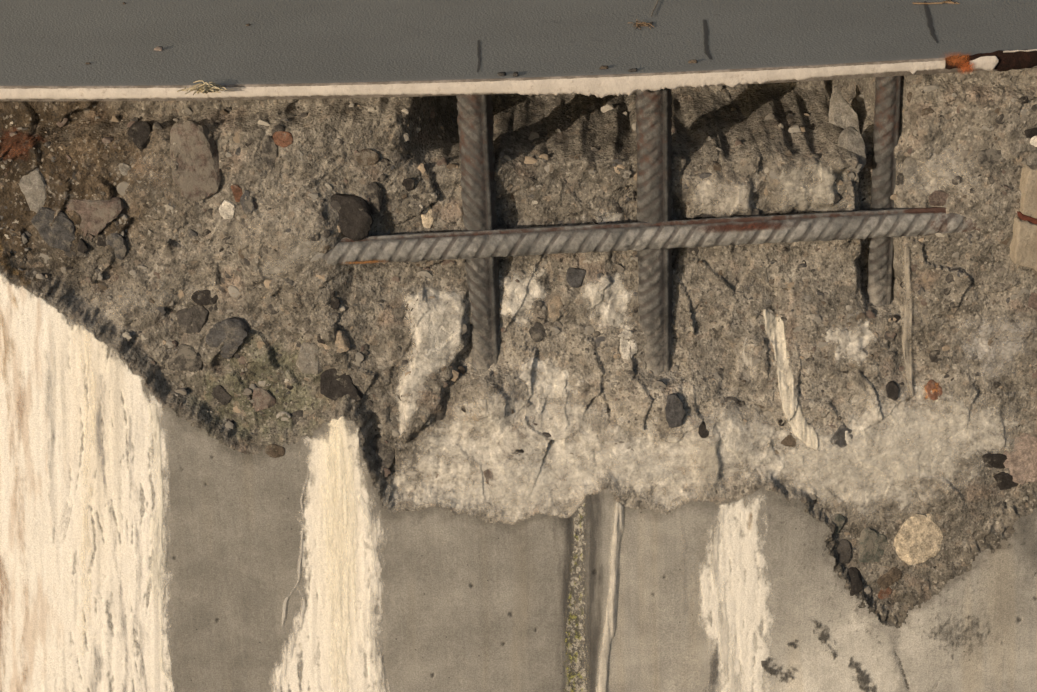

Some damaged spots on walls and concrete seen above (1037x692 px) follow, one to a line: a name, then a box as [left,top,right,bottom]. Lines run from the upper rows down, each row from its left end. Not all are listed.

rust [947,54,973,72]
peeling [945,49,1037,72]
spalling [310,76,977,265]
spalling [465,257,502,370]
spalling [637,248,673,375]
spalling [867,237,894,306]
water stain [964,327,1021,373]
water stain [0,274,174,692]
spalling [482,467,496,494]
spalling [492,405,557,485]
water stain [393,247,1004,692]
water stain [273,417,389,692]